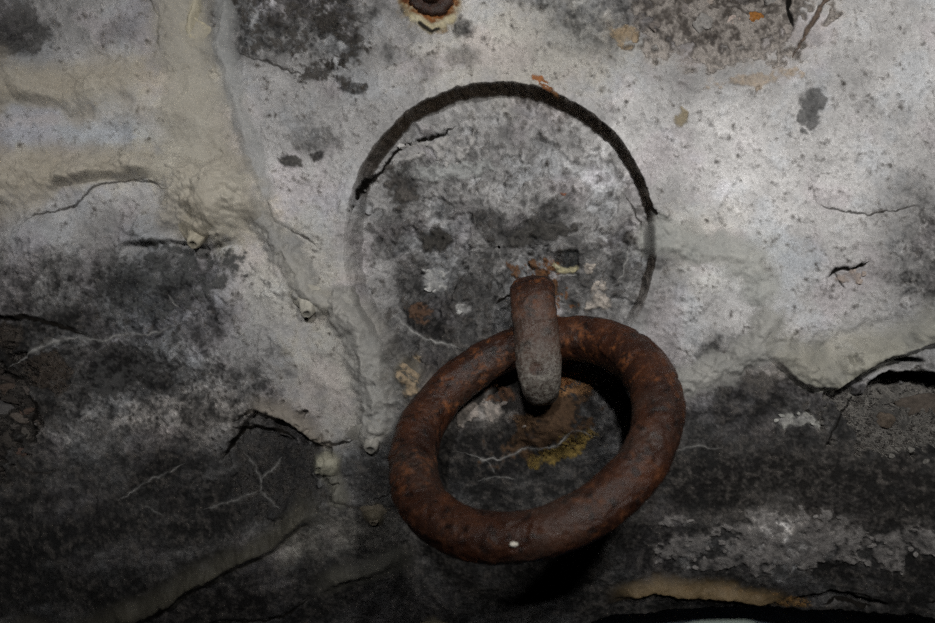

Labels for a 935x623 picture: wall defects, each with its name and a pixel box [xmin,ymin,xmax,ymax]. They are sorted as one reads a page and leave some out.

corrosion [399,0,460,32]
spalling [623,0,814,75]
crack [786,0,829,58]
spalling [822,4,842,27]
crack [34,178,166,215]
crack [349,125,458,216]
water stain [110,238,246,313]
corrosion [506,258,574,317]
corrosion [397,358,420,395]
crack [223,409,352,458]
corrosion [478,360,596,470]
spalling [774,357,935,465]